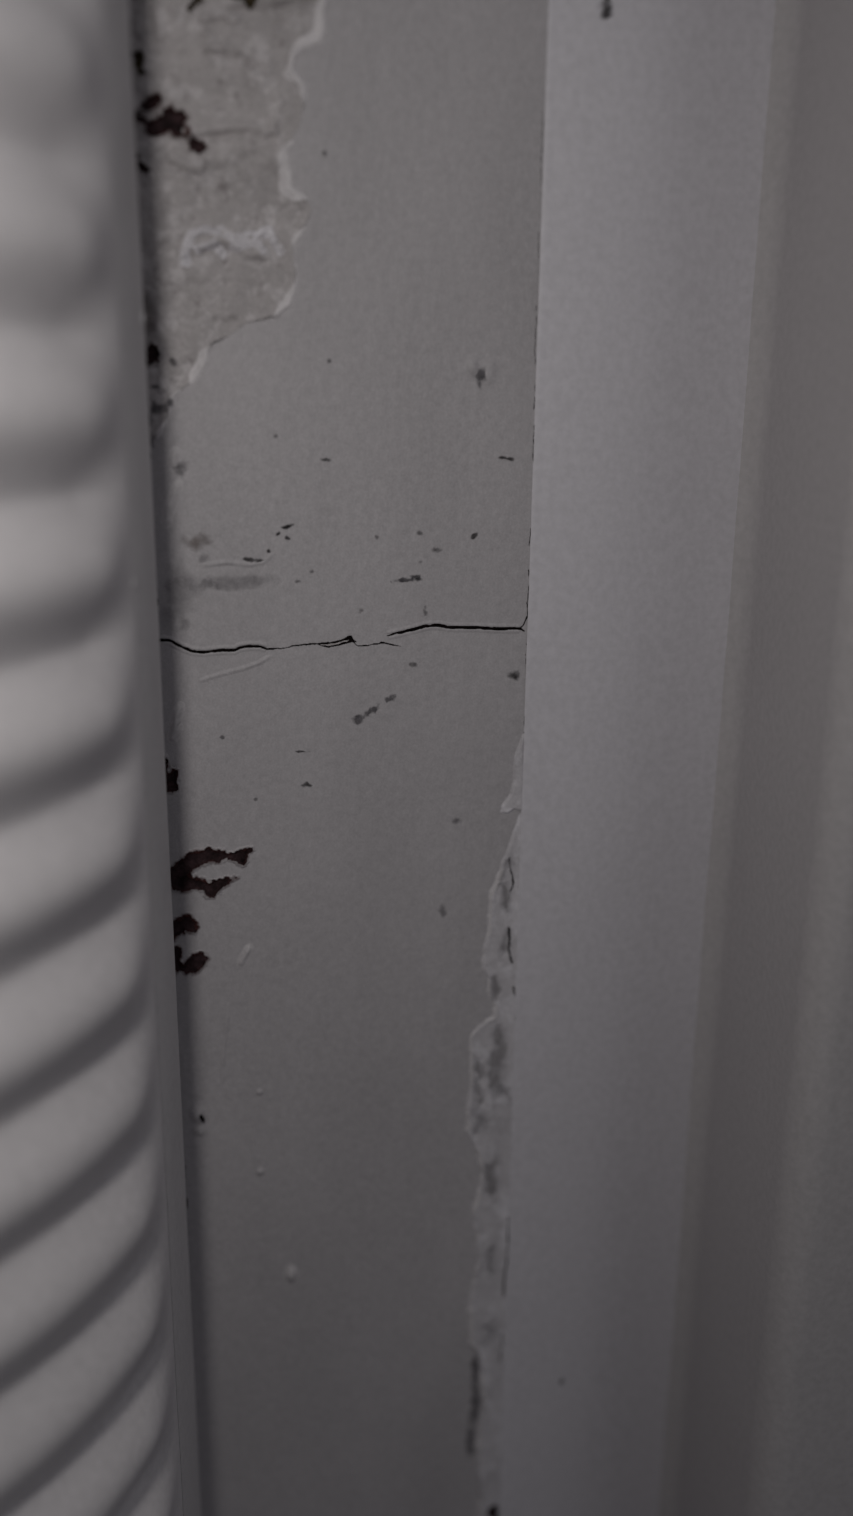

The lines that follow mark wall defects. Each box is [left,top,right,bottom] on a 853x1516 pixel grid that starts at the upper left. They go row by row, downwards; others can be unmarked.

peeling [129,0,329,440]
crack [159,528,531,679]
peeling [465,733,524,1516]